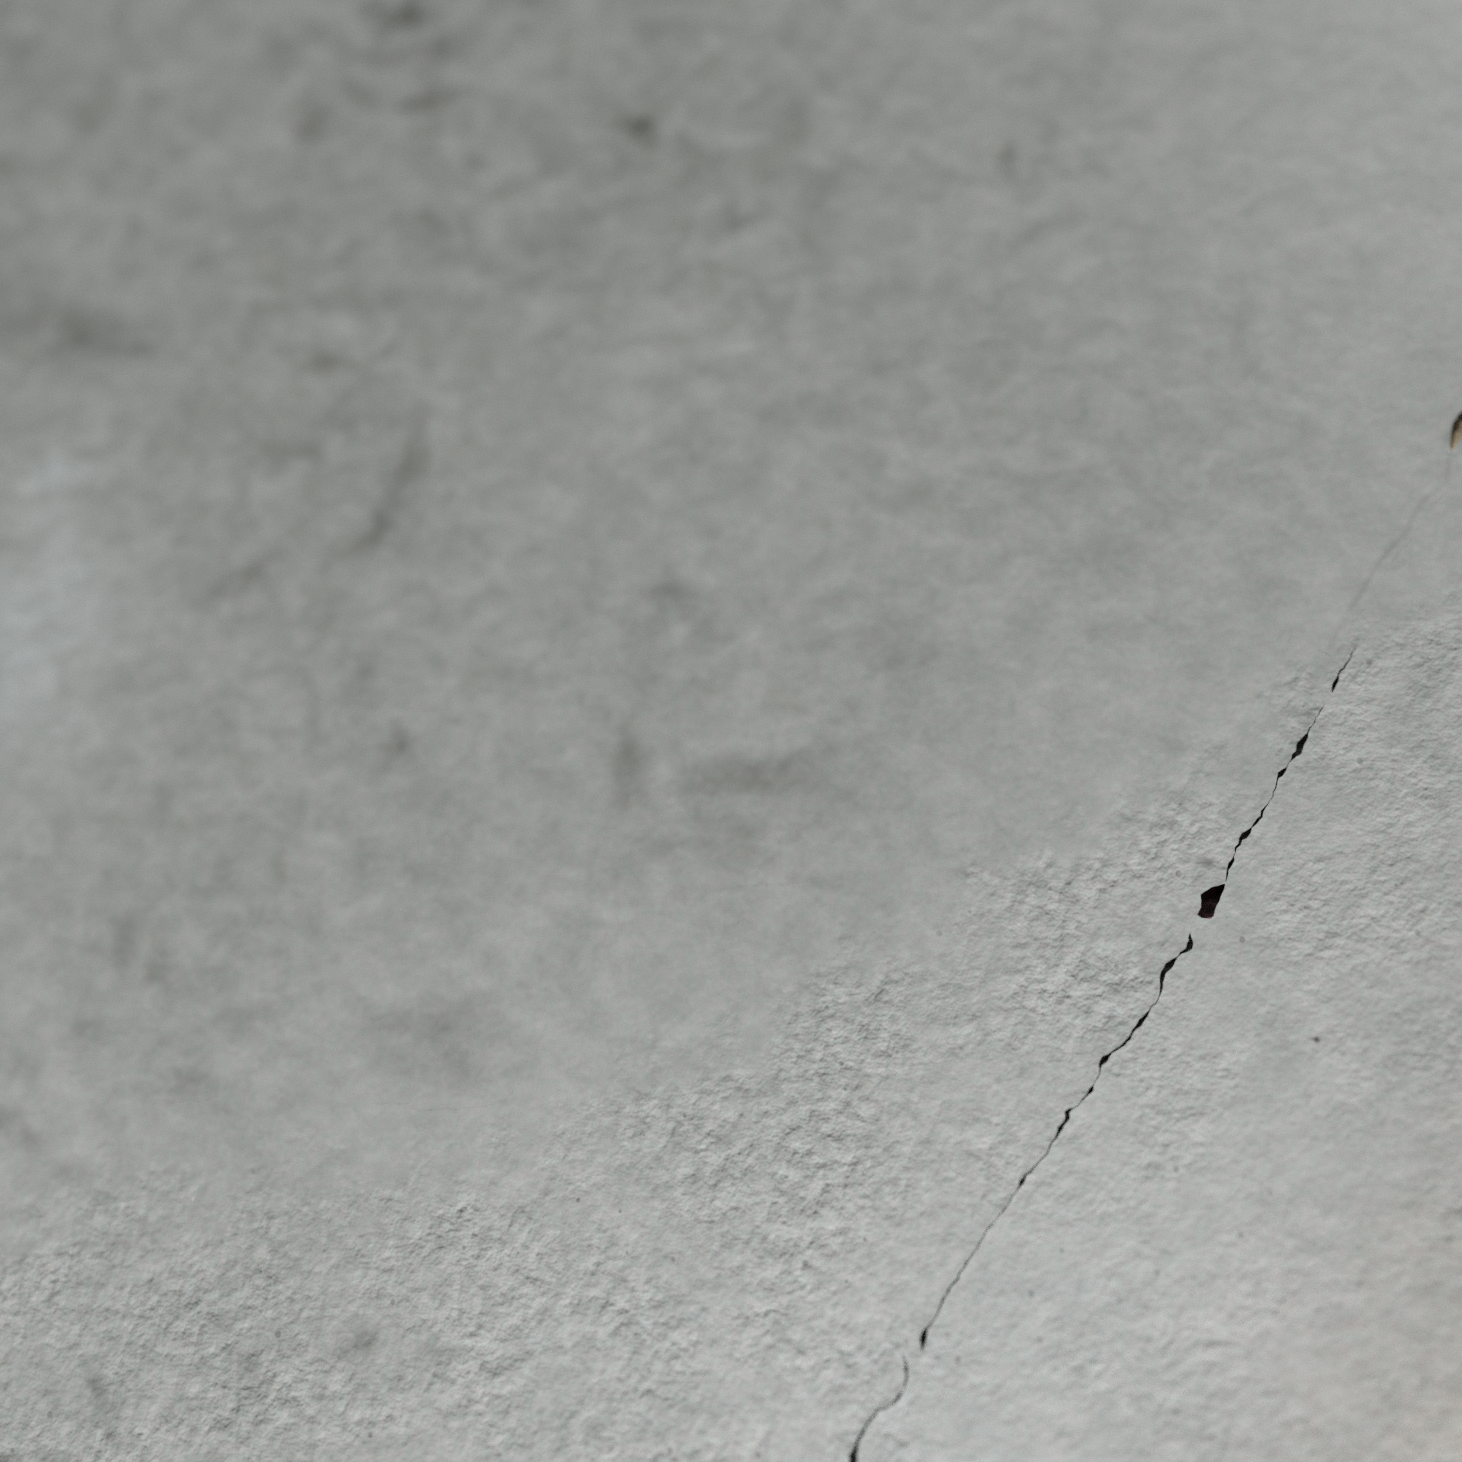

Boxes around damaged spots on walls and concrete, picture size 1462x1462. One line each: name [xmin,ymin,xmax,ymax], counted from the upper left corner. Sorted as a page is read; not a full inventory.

crack [1191,456,1459,882]
crack [849,934,1193,1462]